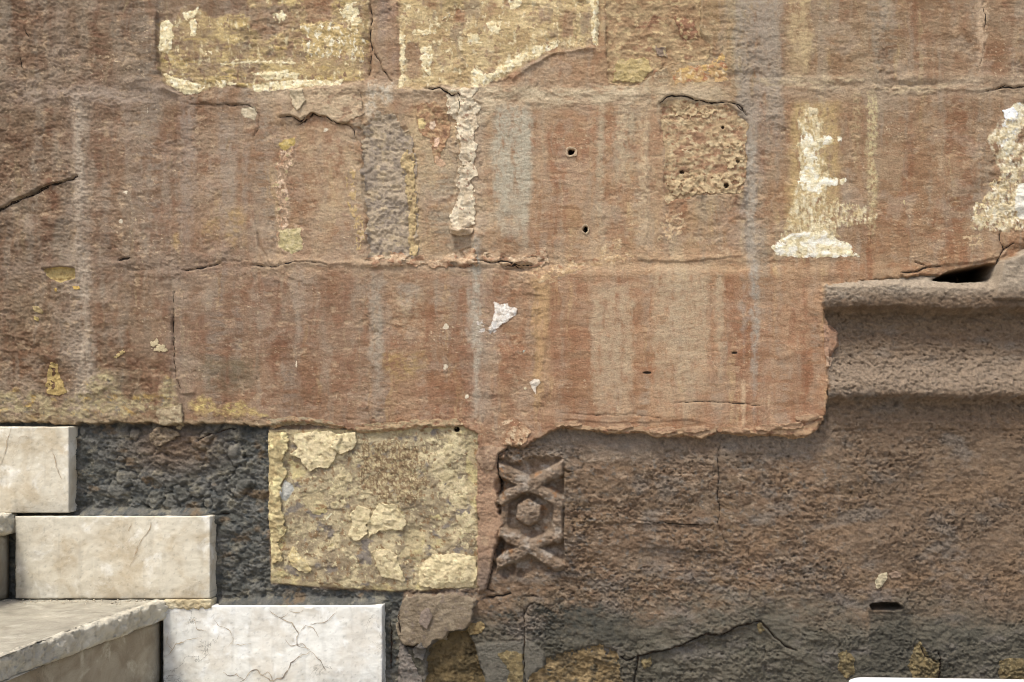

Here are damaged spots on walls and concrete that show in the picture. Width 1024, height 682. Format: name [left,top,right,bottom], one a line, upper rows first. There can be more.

crack [0,175,78,211]
crack [217,104,355,136]
peeling [155,0,729,284]
peeling [771,102,890,259]
peeling [962,102,1024,248]
flaking render [150,338,168,352]
peeling [0,349,531,682]
crack [165,620,250,657]
crack [223,610,335,682]
crack [621,621,792,682]